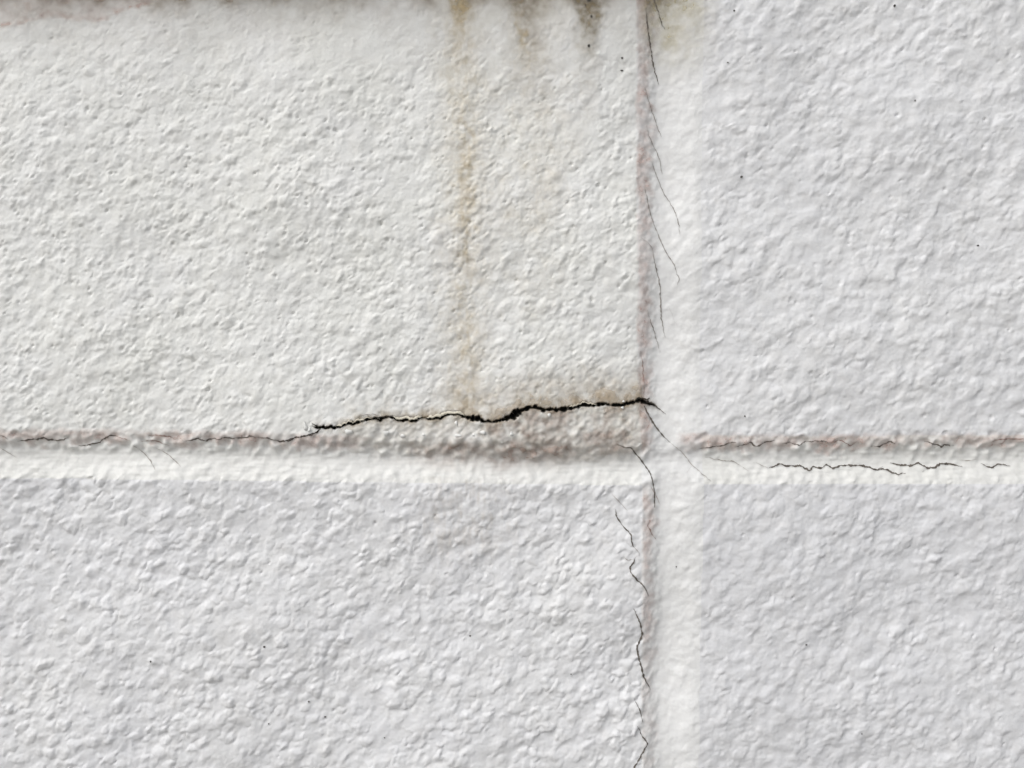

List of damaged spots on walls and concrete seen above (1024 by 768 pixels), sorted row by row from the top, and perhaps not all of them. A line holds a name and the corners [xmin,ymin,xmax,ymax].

damp [575,0,601,27]
crack [0,0,1022,480]
crack [615,444,660,768]